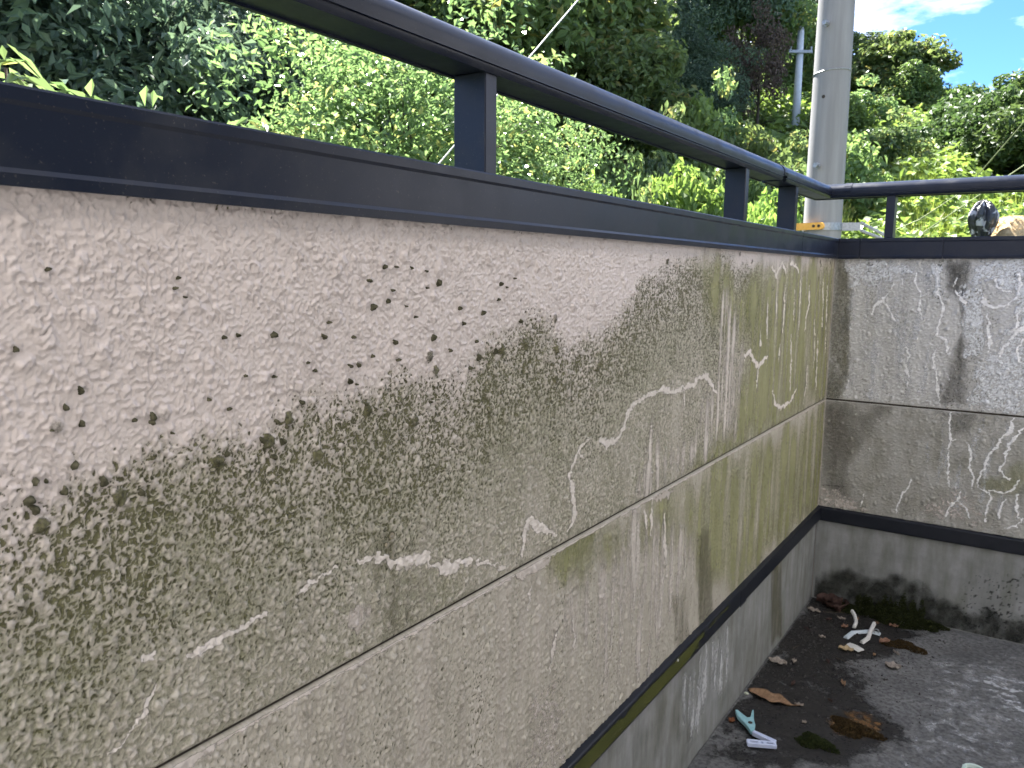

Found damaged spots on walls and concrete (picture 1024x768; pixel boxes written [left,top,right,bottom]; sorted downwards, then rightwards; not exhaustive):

leakage [923,261,990,307]
crack [870,264,1024,529]
leakage [945,318,997,409]
leakage [0,251,768,766]
crack [298,371,717,594]
crack [186,611,268,659]
crack [549,617,576,672]
leakage [814,570,1024,643]